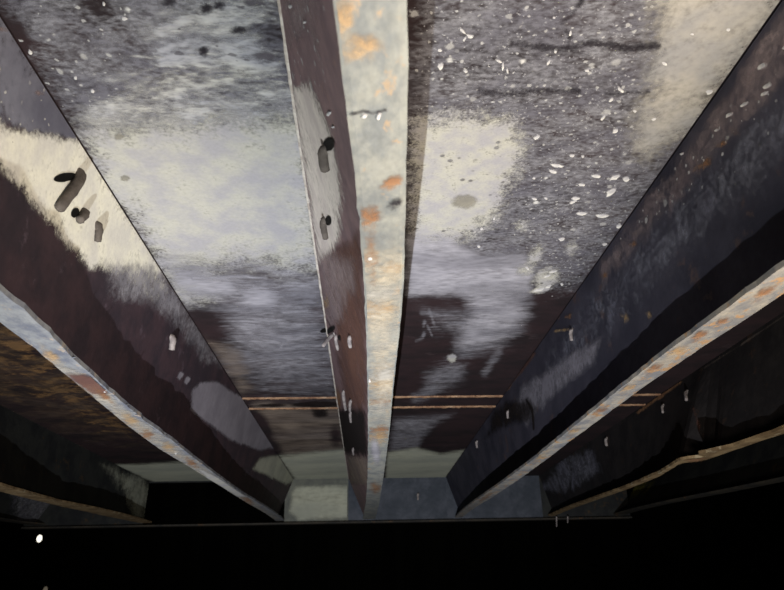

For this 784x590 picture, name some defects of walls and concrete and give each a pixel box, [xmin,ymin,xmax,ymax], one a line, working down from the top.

rust [338,7,352,32]
crack [510,30,660,51]
crack [485,88,580,96]
damp [0,0,354,389]
rust [382,177,401,189]
efflorescence [366,0,784,412]
rust [0,327,203,475]